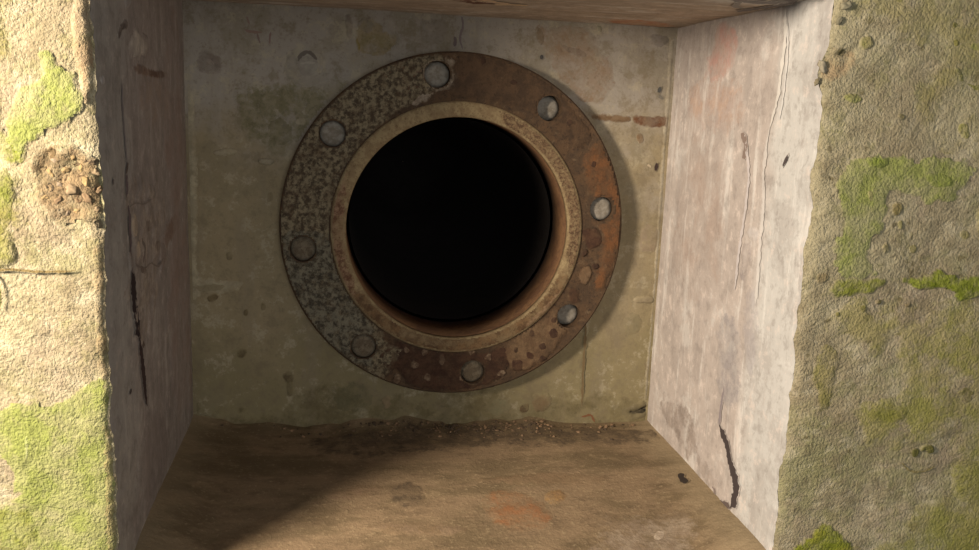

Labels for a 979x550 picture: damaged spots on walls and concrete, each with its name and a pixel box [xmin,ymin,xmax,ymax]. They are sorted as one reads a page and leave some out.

peeling [0,50,114,229]
crack [122,83,148,406]
rust [332,171,360,302]
rust [448,54,666,292]
rust [379,308,560,391]
crack [711,387,741,509]